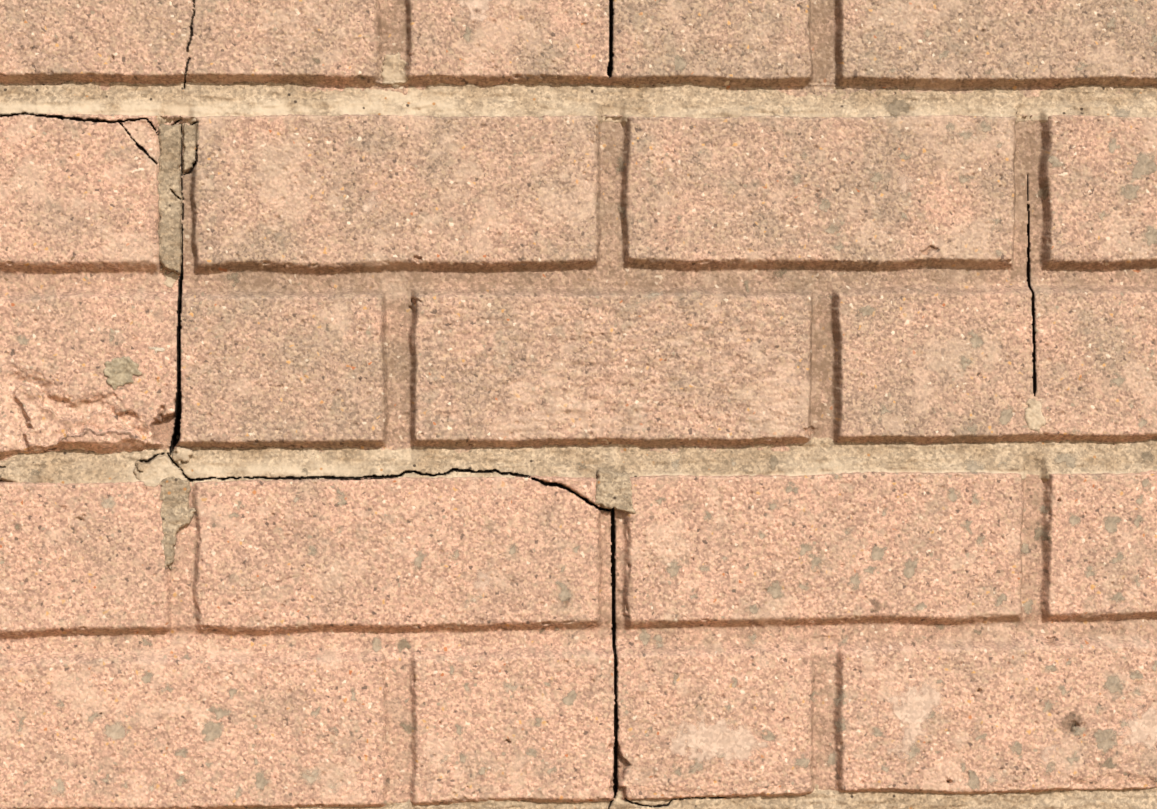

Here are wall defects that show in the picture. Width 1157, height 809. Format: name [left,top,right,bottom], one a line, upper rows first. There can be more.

crack [184,0,195,88]
crack [606,0,614,77]
crack [1026,174,1037,396]
spalling [0,363,176,460]
crack [0,113,724,809]